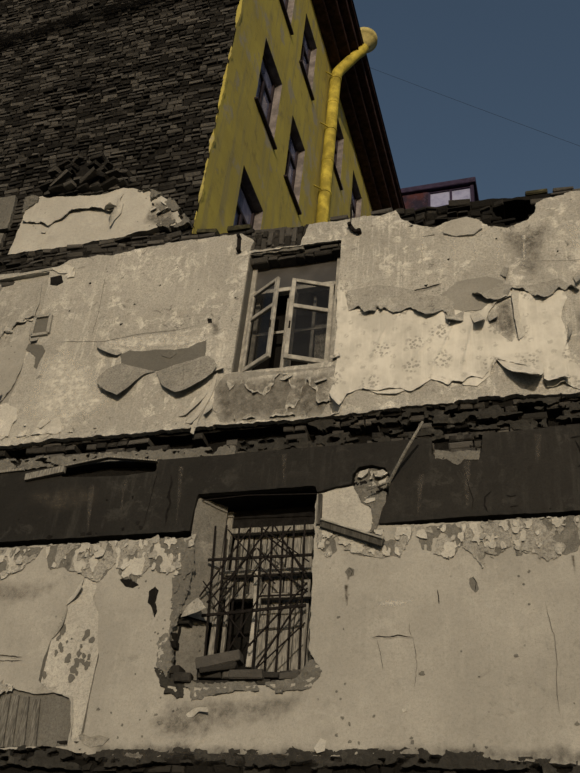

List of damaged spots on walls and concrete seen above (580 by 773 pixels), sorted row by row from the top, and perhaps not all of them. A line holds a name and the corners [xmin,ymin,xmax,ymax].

spalling [21,195,40,215]
flaking render [395,199,532,237]
peeling [0,264,76,440]
flaking render [0,334,580,471]
flaking render [316,468,580,568]
flaking render [0,535,322,717]
crack [372,630,417,687]